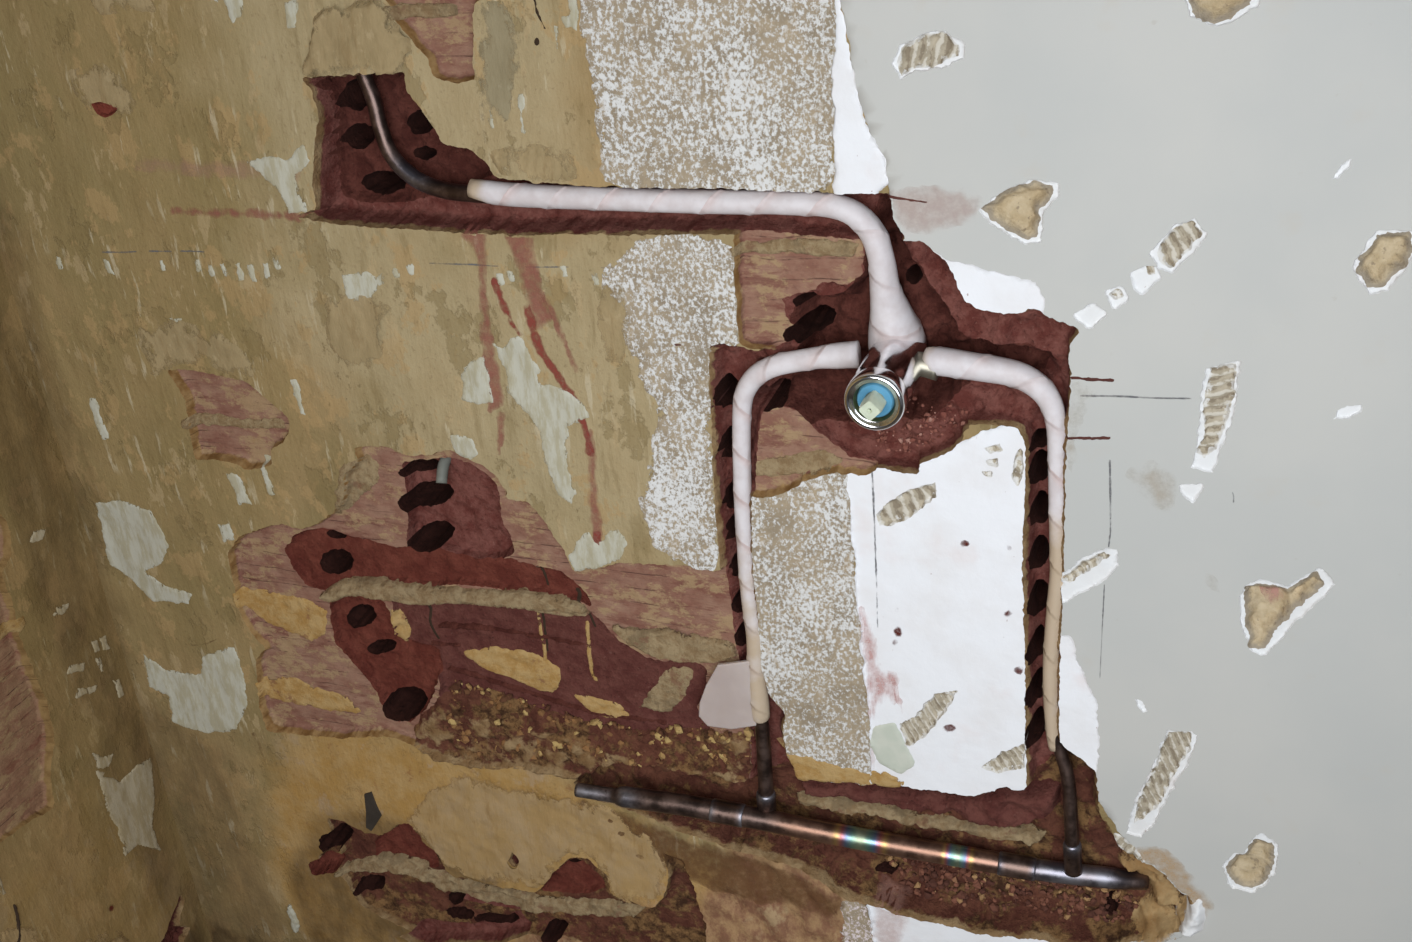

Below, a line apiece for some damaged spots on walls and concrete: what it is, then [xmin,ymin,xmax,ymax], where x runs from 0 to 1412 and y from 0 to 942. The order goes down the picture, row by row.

peeling [284,0,579,182]
spalling [874,194,1057,374]
spalling [978,179,1060,245]
spalling [1352,229,1412,295]
peeling [461,336,589,504]
spalling [730,230,878,498]
spalling [902,376,971,420]
spalling [876,483,937,526]
spalling [1239,568,1335,656]
spalling [143,435,752,942]
peeling [870,690,958,774]
spalling [1114,730,1198,863]